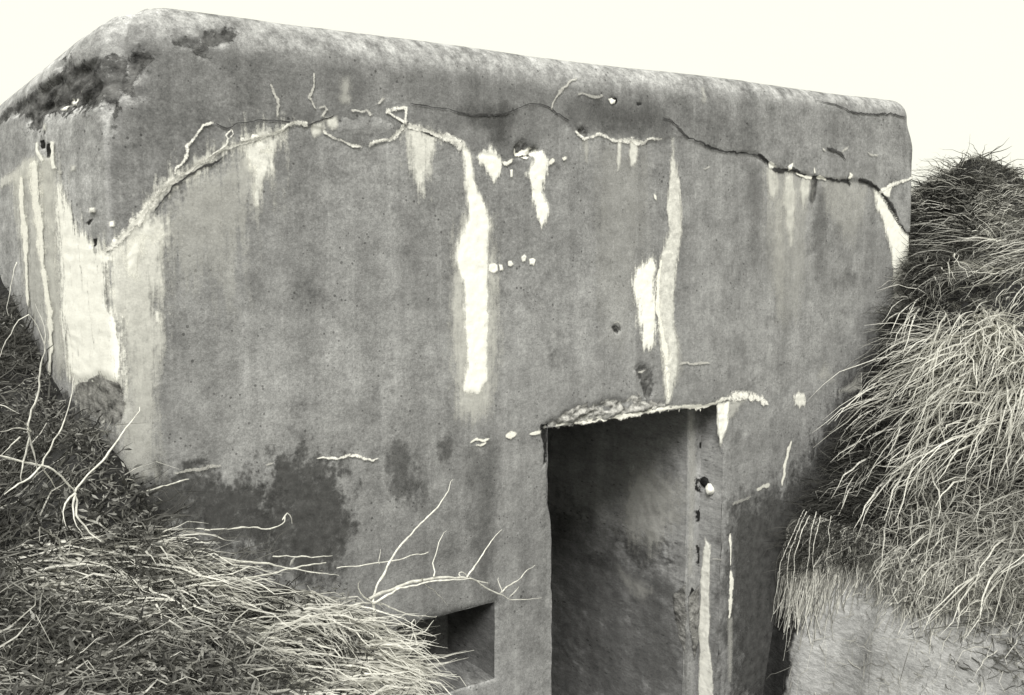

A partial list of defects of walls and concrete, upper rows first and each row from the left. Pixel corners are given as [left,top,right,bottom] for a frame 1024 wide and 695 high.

crack [103,73,913,265]
leakage [0,156,170,445]
leakage [403,123,495,394]
leakage [654,138,683,405]
leakage [874,187,909,308]
crack [175,465,220,474]
leakage [137,442,362,589]
crack [317,453,378,461]
spalling [540,364,718,463]